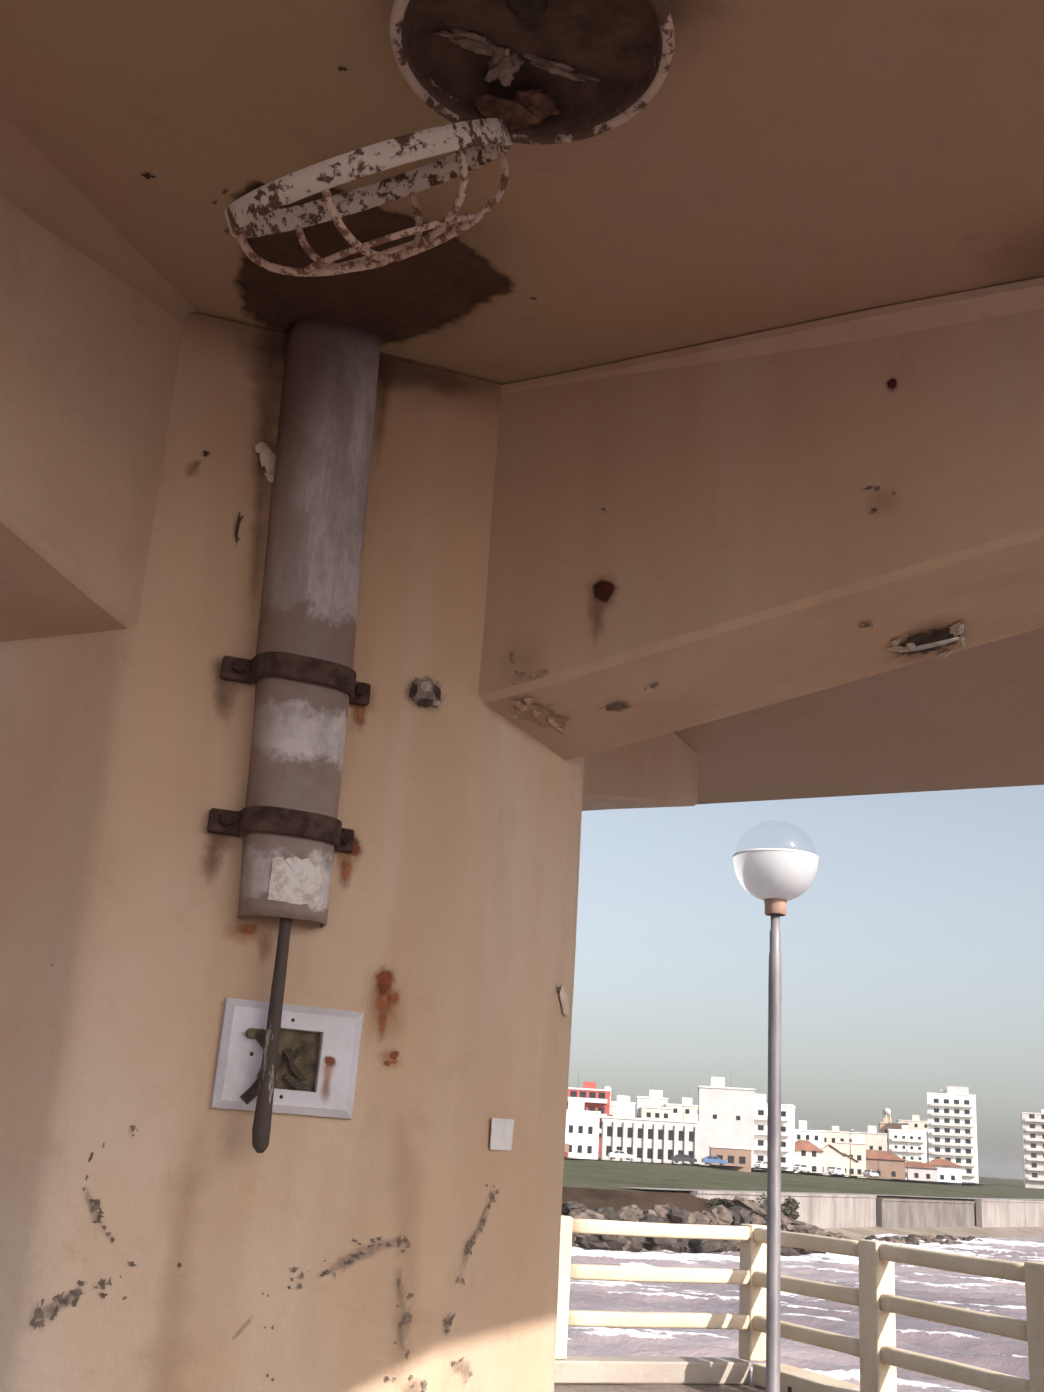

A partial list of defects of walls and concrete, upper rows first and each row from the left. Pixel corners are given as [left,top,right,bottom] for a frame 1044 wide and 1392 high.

spalling [887,622,966,659]
corrosion [342,839,361,881]
corrosion [377,971,398,1034]